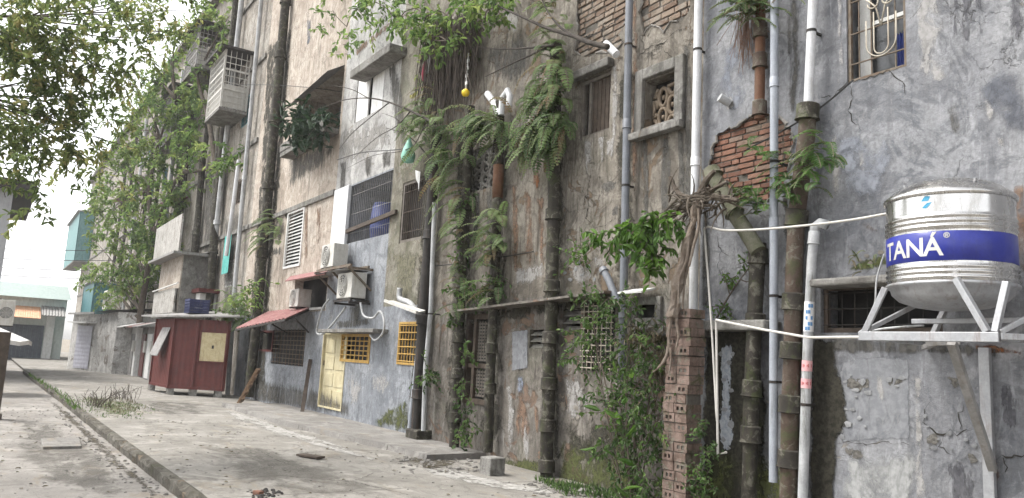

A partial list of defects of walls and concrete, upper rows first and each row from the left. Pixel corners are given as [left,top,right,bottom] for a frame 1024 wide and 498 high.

flaking render [574,0,690,57]
crack [822,66,905,129]
flaking render [708,113,796,203]
damp [445,133,546,459]
peeling [718,345,735,450]
crack [923,402,967,456]